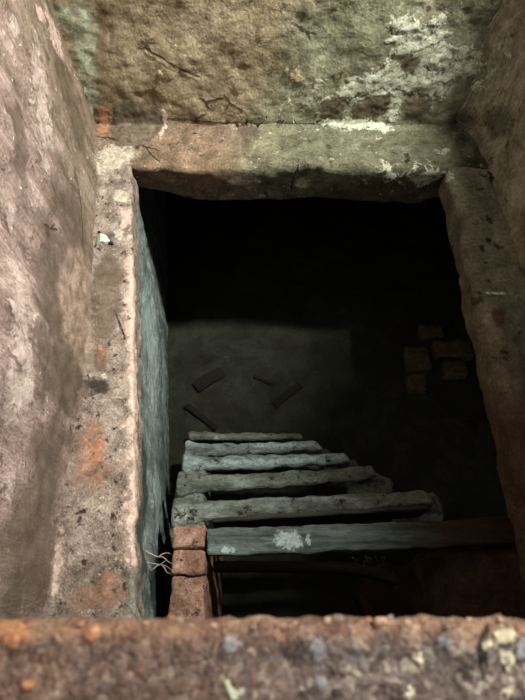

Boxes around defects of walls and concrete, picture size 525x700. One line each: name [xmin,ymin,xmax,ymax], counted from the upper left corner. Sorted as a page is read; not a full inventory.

crack [140,39,200,81]
leakage [280,2,499,132]
crack [161,95,312,128]
leakage [375,157,455,188]